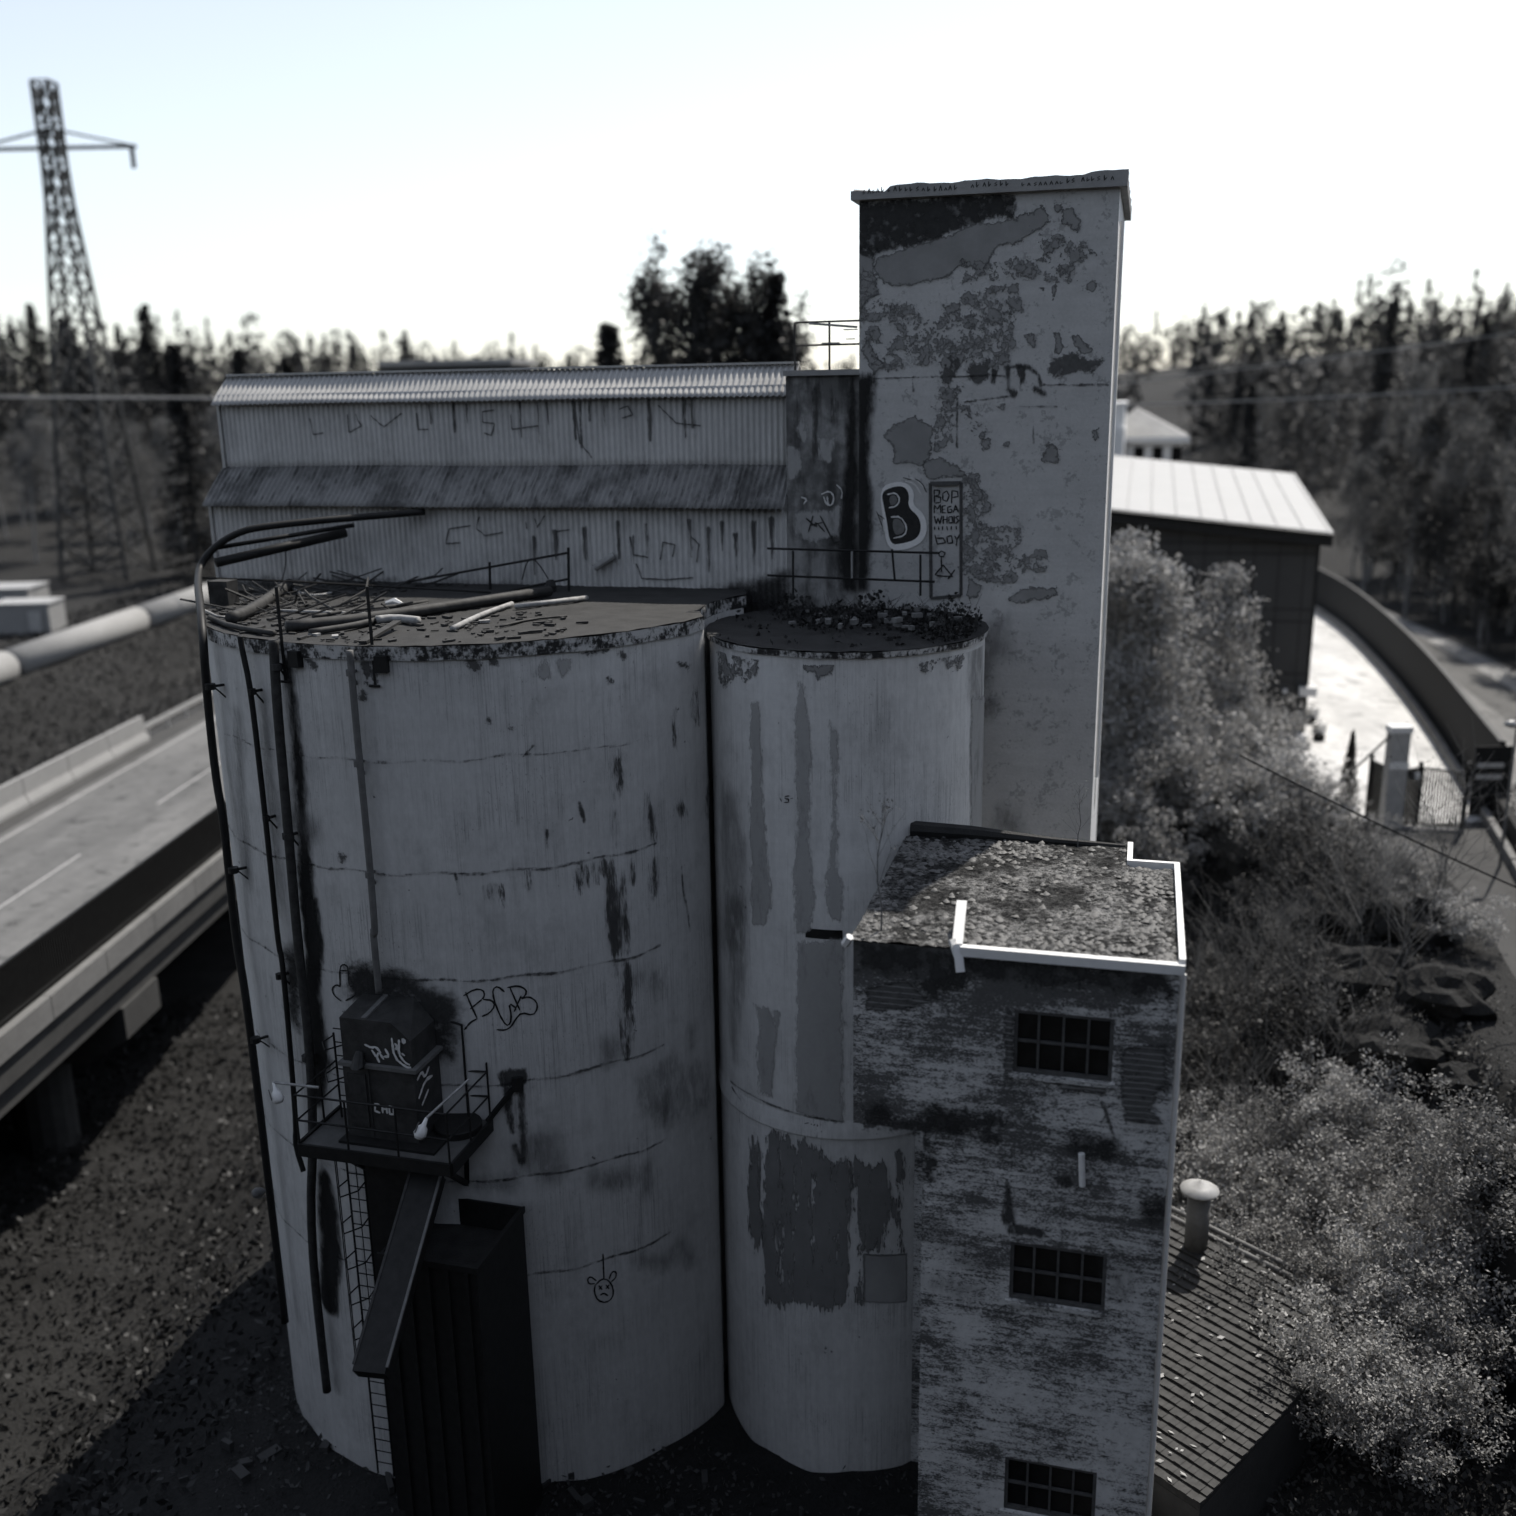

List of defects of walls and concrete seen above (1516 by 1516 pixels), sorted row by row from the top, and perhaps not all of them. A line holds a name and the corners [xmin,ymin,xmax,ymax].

water stain [831,374,875,592]
flaking render [859,204,1103,604]
water stain [283,658,330,1106]
water stain [749,701,772,926]
water stain [793,684,1177,1183]
water stain [318,1170,341,1315]
peeling [747,1128,914,1314]